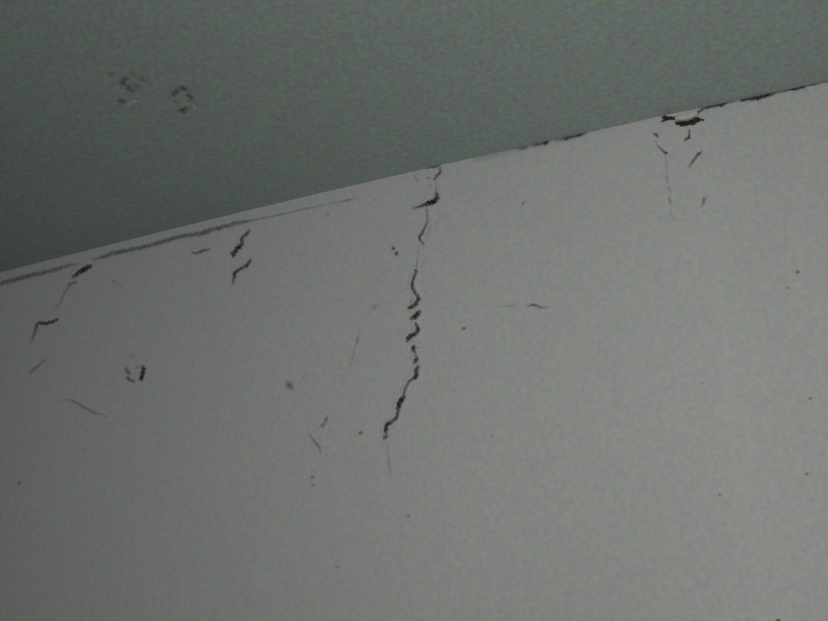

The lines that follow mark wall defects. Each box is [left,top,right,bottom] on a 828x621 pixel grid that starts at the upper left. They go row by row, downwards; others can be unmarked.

flaking render [661,109,705,126]
crack [413,191,445,238]
crack [70,260,92,281]
crack [231,233,251,278]
crack [379,270,425,437]